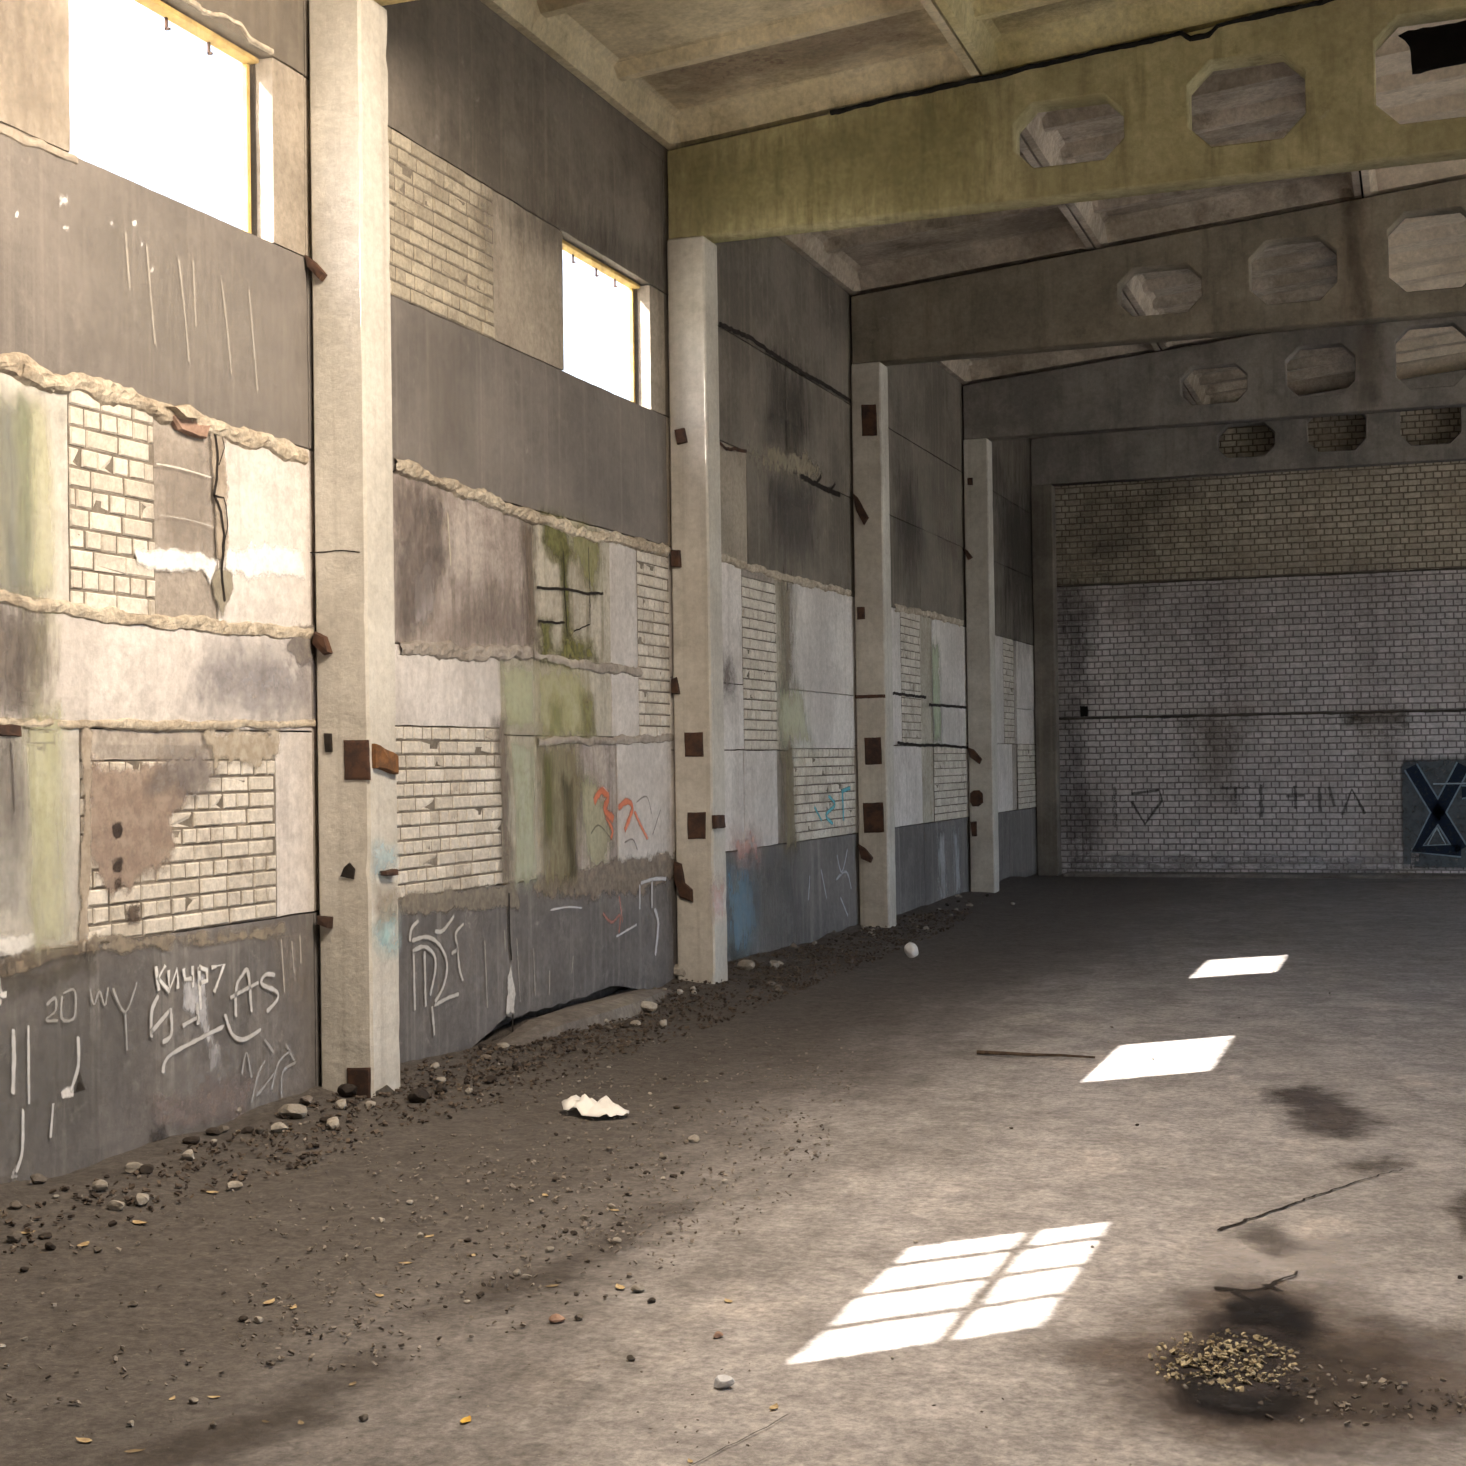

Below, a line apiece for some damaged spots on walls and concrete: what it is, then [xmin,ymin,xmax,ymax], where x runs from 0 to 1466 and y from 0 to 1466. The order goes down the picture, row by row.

crack [719,322,851,403]
spalling [0,352,316,665]
crack [720,442,747,453]
crack [800,474,840,497]
flaking render [0,716,333,978]